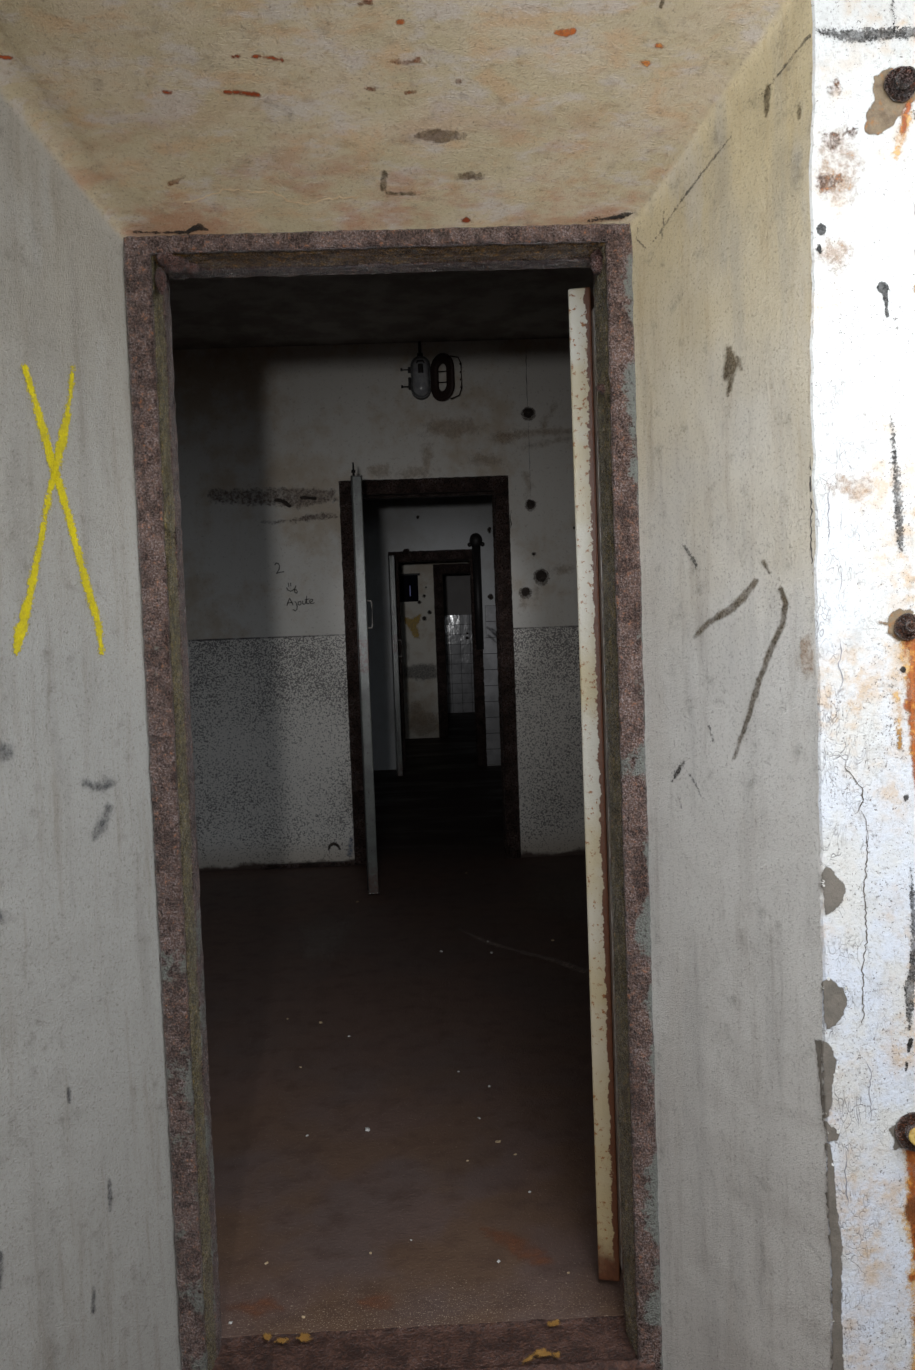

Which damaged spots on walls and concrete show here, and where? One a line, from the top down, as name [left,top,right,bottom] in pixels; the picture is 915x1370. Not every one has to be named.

rust [893,102,912,158]
rust [893,638,915,779]
rust [902,1150,915,1370]